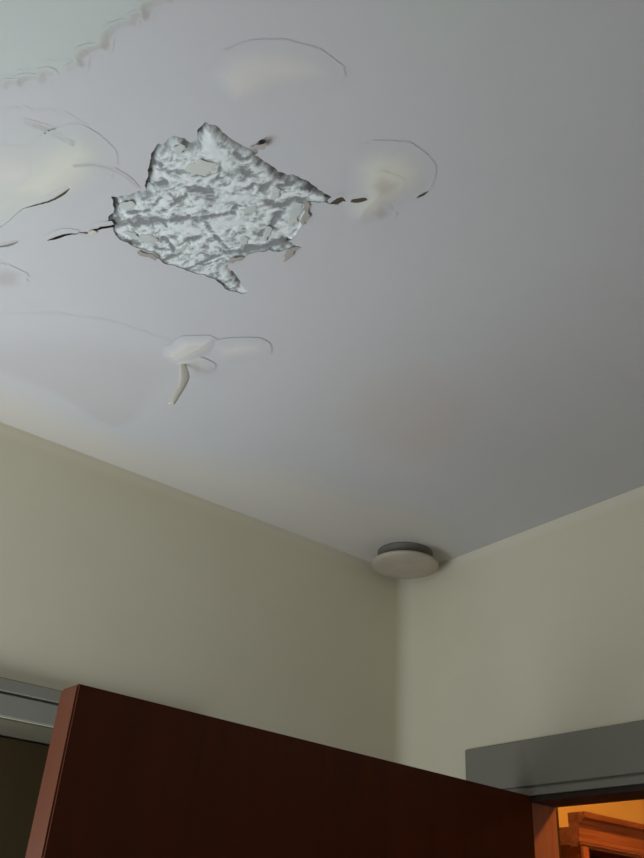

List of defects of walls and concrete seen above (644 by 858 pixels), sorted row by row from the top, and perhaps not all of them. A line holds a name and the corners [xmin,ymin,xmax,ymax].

crack [0,162,140,249]
flaking render [108,122,339,294]
crack [327,193,369,204]
crack [413,188,429,198]
water stain [0,0,644,564]
peeling [162,335,272,375]